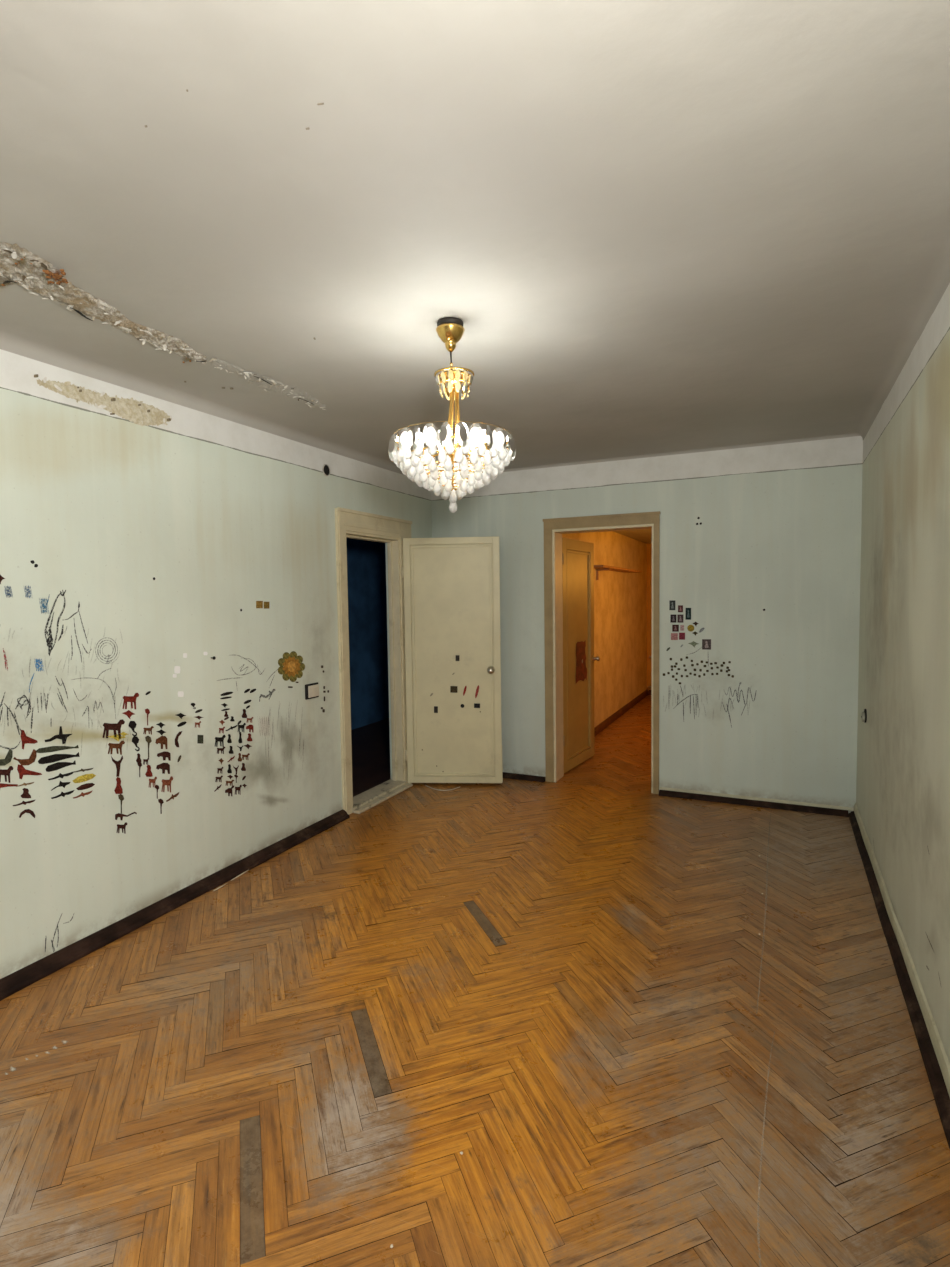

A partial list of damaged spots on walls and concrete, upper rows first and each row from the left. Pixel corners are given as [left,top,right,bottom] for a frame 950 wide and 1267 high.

peeling [34,374,172,426]
flaking render [0,242,326,410]
damp [879,314,950,706]